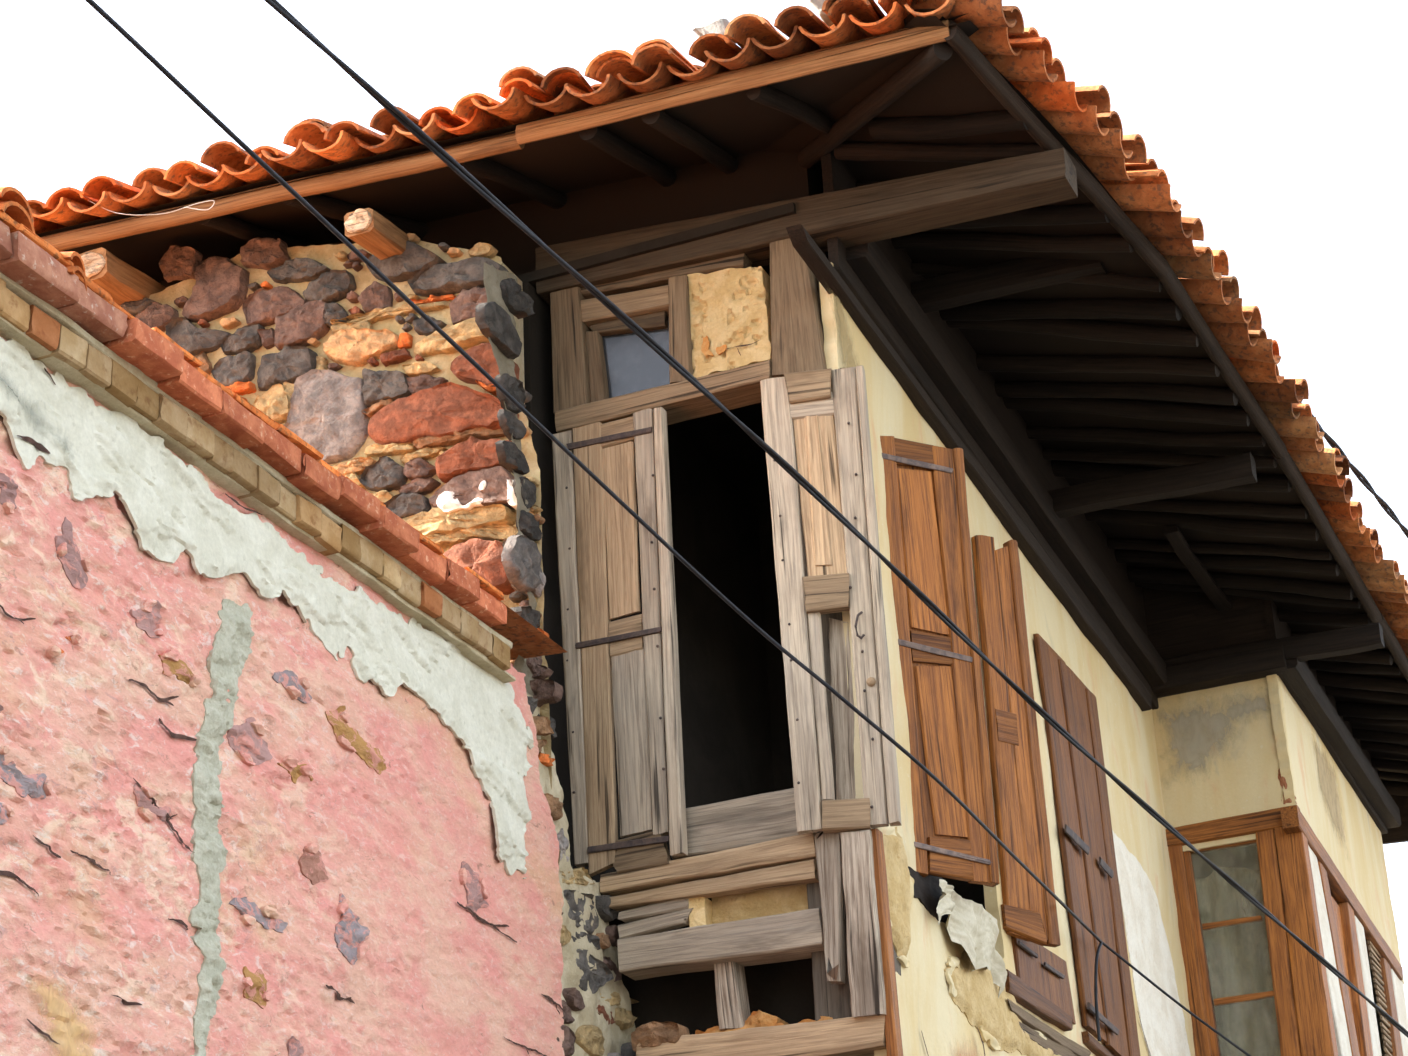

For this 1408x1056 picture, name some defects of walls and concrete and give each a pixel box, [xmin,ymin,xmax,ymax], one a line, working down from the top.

peeling [0,473,18,515]
peeling [54,517,92,589]
peeling [129,599,202,688]
peeling [272,670,312,704]
peeling [0,745,53,825]
peeling [226,717,314,784]
peeling [325,706,387,775]
damp [188,599,254,1056]
peeling [298,842,329,885]
peeling [334,893,371,965]
peeling [877,824,949,968]
peeling [944,950,1061,1056]